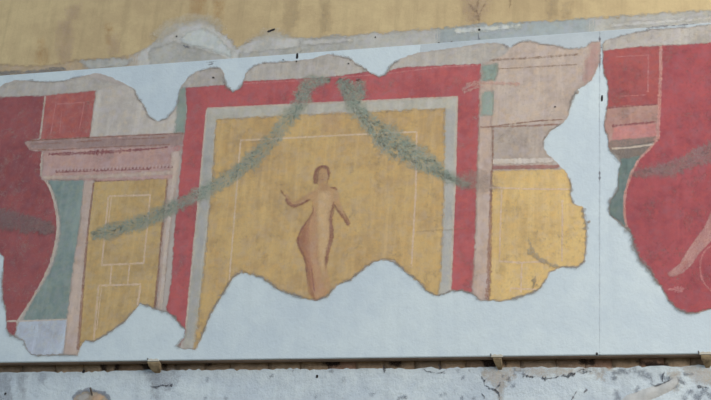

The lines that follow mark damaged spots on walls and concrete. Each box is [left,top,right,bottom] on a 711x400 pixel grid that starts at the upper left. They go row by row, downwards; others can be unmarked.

flaking render [0,9,711,121]
flaking render [0,364,151,373]
flaking render [161,360,496,371]
flaking render [502,358,704,369]
crack [524,369,592,400]